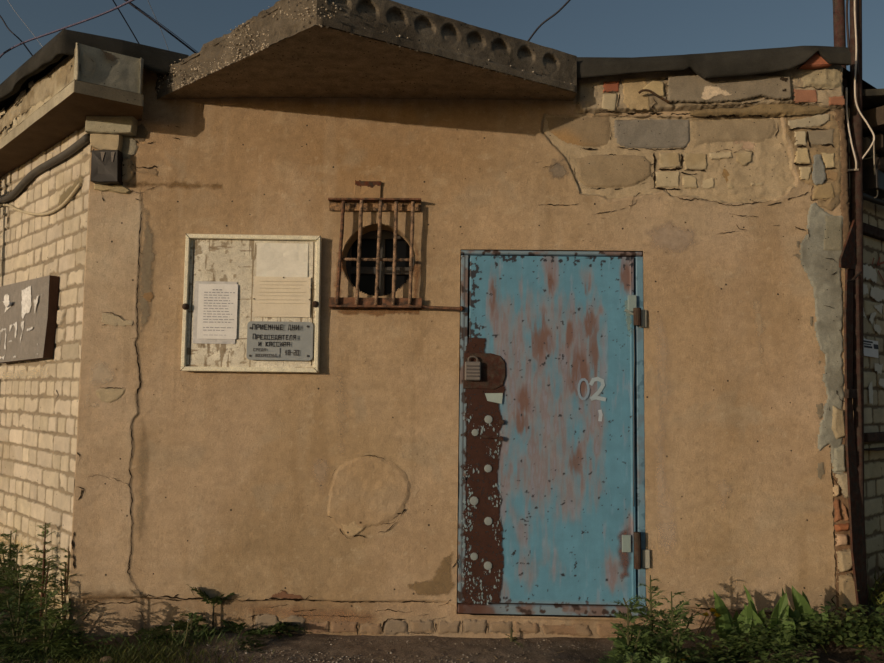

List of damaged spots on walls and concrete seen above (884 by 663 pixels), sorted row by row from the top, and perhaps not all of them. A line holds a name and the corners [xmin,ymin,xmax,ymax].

flaking render [0,63,72,132]
spalling [543,80,845,211]
corrosion [355,180,381,188]
corrosion [464,337,486,353]
crack [77,164,450,631]
corrosion [462,385,506,605]
crack [69,532,77,569]
corrosion [619,531,628,578]